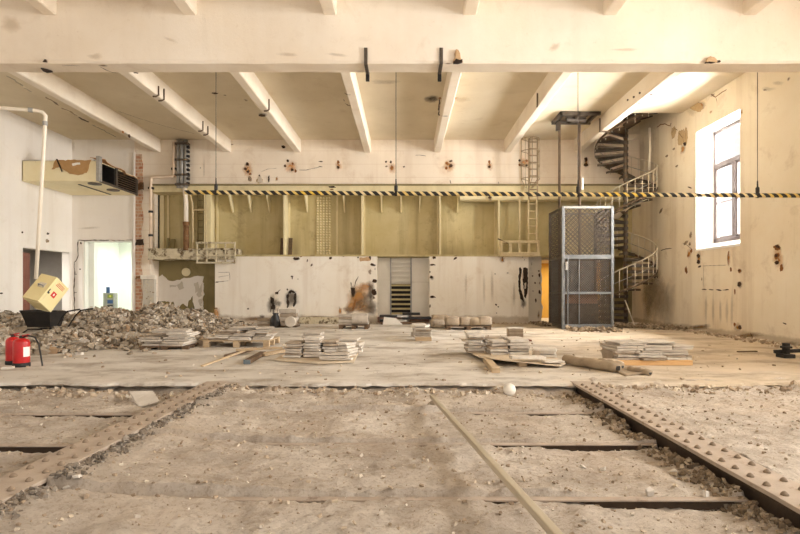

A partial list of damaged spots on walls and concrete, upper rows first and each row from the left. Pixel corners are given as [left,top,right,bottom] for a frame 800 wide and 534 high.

peeling [665,126,688,157]
peeling [158,275,205,310]
water stain [249,290,296,320]
rust [339,284,374,313]